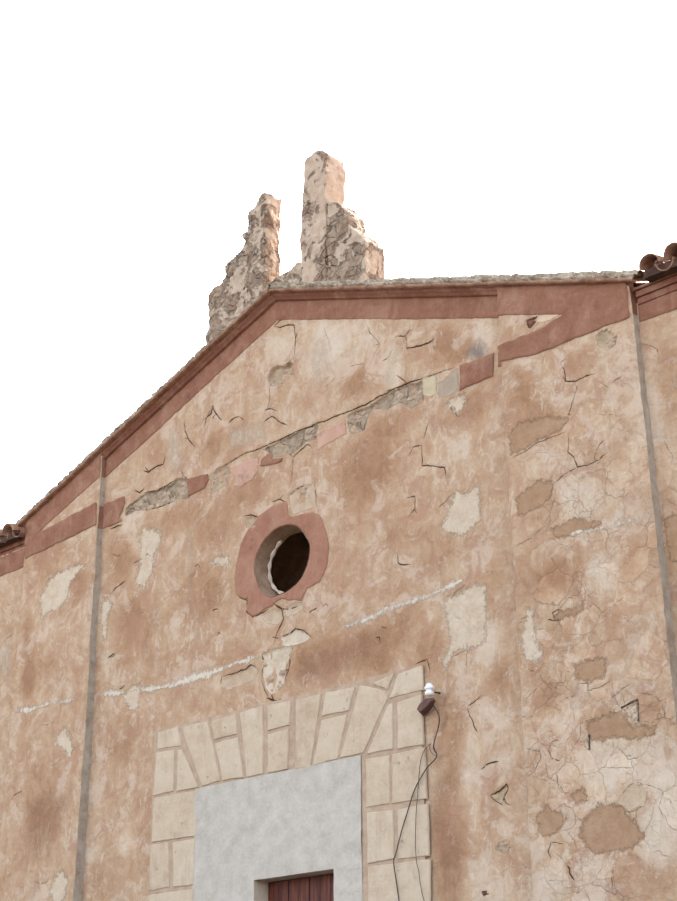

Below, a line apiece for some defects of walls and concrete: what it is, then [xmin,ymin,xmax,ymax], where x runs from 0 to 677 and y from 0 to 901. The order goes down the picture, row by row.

crack [274,320,297,365]
crack [184,329,452,474]
spalling [264,423,318,457]
crack [514,359,620,545]
spalling [125,478,190,516]
spalling [289,482,316,514]
spalling [261,601,303,624]
spalling [222,630,310,694]
crack [524,662,665,724]
crack [491,783,510,805]